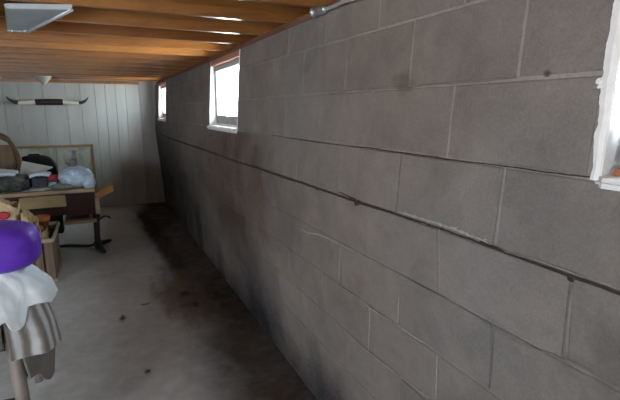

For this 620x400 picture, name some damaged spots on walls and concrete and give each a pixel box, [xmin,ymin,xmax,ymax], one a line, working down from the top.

damp [138,137,336,400]
crack [160,134,620,399]
crack [273,95,590,177]